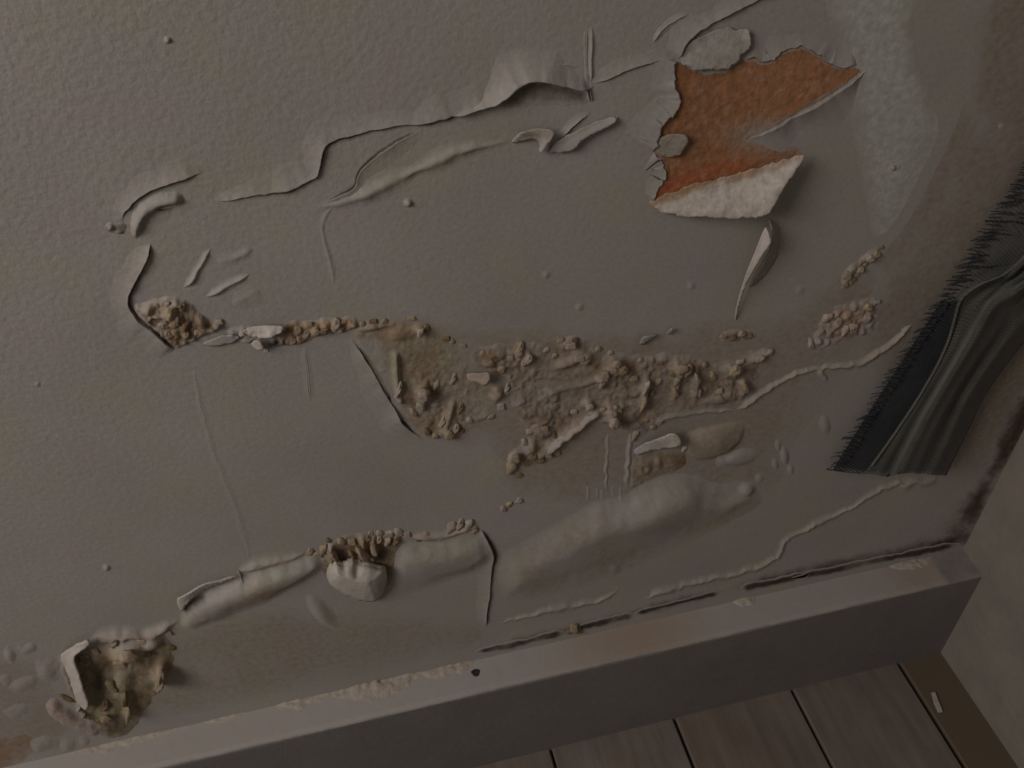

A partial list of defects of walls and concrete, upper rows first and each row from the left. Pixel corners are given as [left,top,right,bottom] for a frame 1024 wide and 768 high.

peeling [110,27,865,489]
flaking render [807,296,881,353]
crack [472,529,961,653]
flaking render [46,619,179,738]